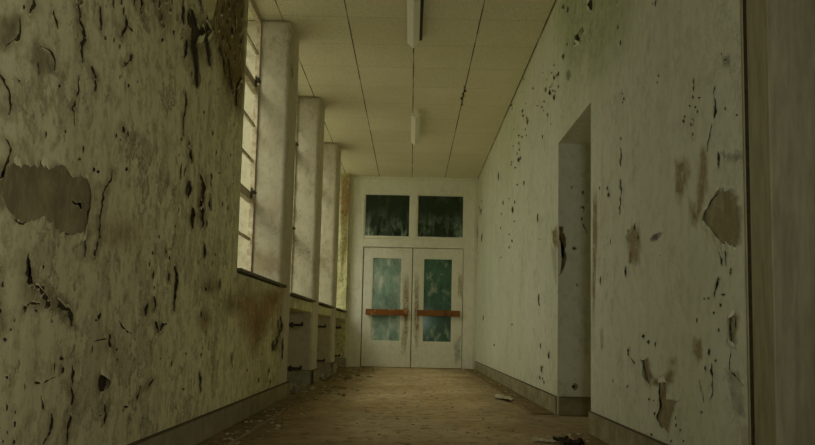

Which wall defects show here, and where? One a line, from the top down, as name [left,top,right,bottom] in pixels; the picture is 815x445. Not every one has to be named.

peeling [153,0,244,108]
spalling [2,145,100,260]
peeling [180,164,221,234]
spalling [559,226,577,275]
peeling [624,224,639,279]
spalling [701,182,740,256]
peeling [23,253,74,330]
peeling [713,303,737,349]
spalling [98,366,111,400]
spalling [640,332,685,443]